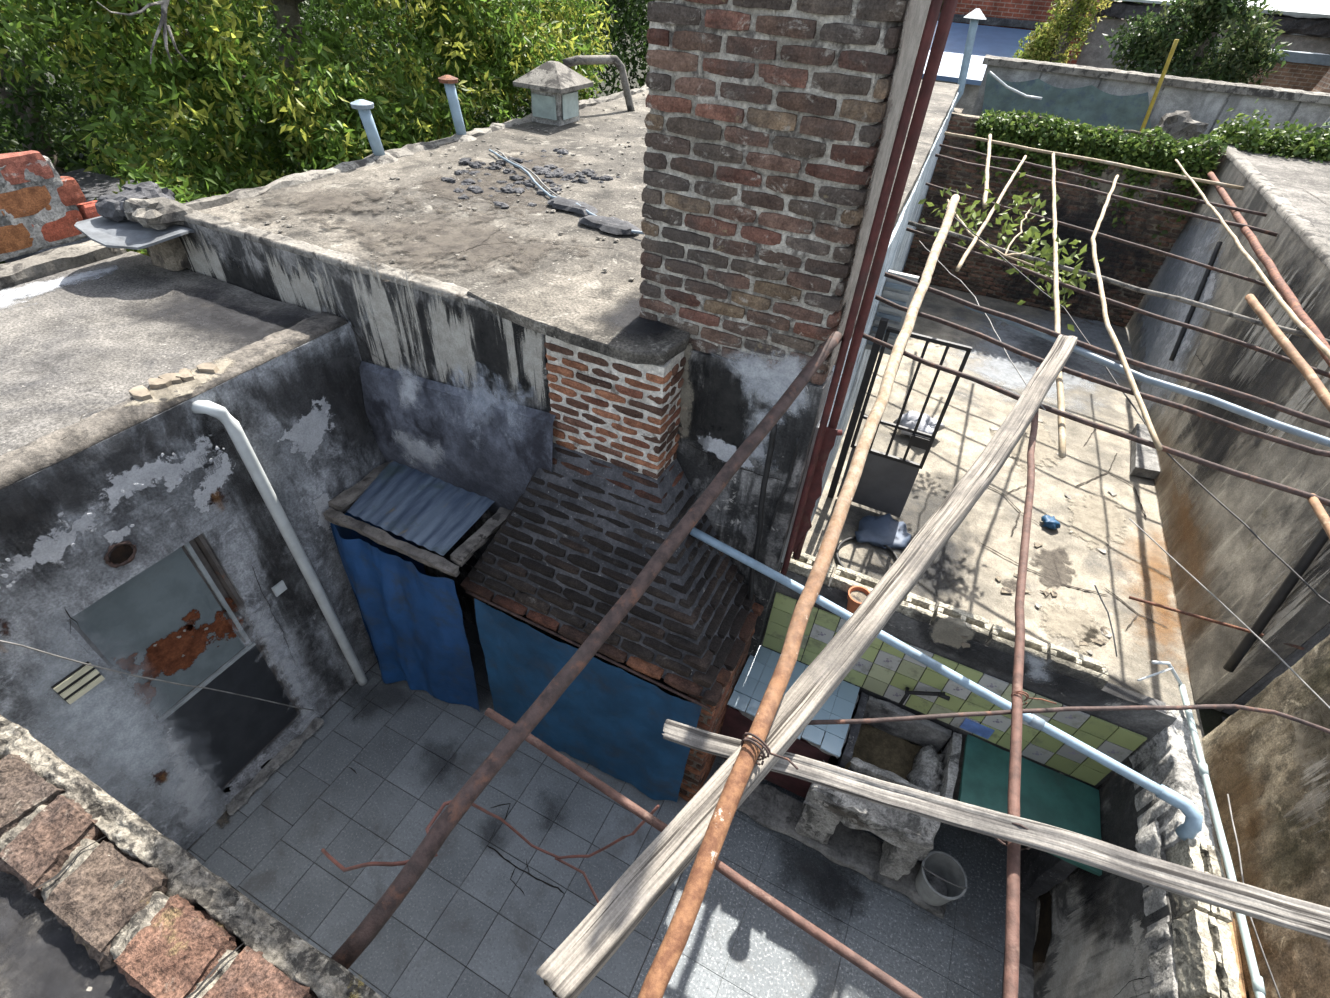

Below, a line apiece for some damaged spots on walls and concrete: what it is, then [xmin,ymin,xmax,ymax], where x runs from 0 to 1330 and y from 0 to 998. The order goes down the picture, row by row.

water stain [124,235,335,351]
water stain [234,147,595,458]
peeling [277,396,341,464]
water stain [679,356,805,470]
peeling [0,435,236,589]
rust [113,598,244,708]
water stain [1283,694,1330,835]